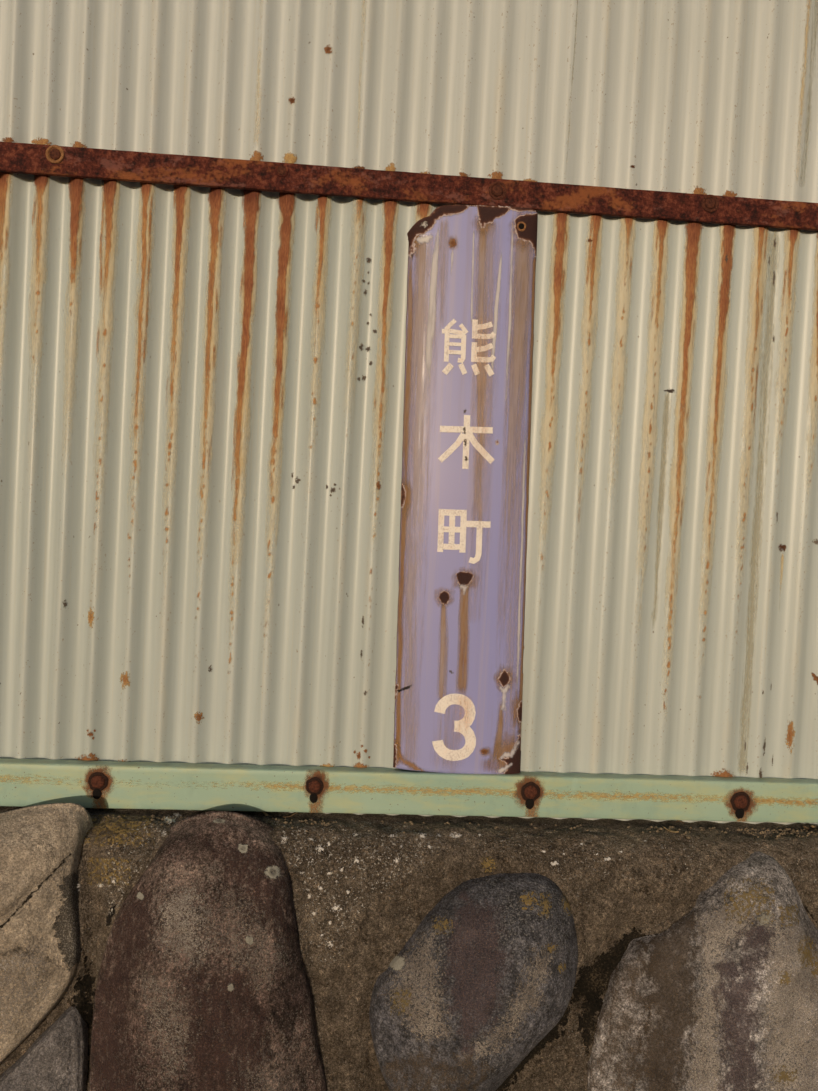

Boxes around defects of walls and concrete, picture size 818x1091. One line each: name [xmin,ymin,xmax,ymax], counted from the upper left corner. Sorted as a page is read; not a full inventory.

corrosion [0,137,818,649]
corrosion [786,721,795,753]
corrosion [77,753,113,808]
corrosion [246,764,818,822]
crack [0,854,71,959]